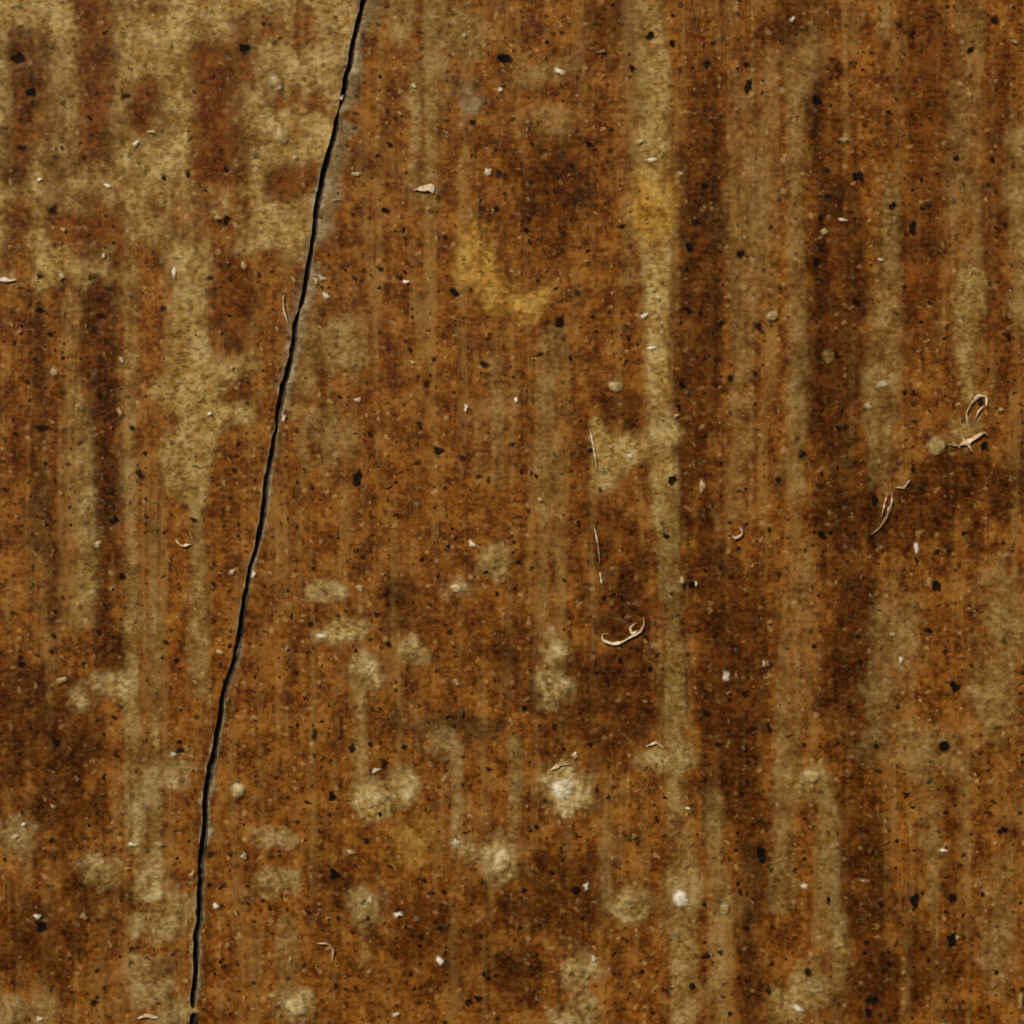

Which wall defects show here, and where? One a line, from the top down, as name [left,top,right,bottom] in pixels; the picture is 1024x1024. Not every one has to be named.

water stain [69,384,96,628]
corrosion [84,243,128,676]
crack [187,0,375,1024]
peeling [601,617,645,646]
corrosion [686,513,768,824]
peeling [871,480,911,535]
corrosion [799,122,1024,763]
water stain [666,765,702,1024]